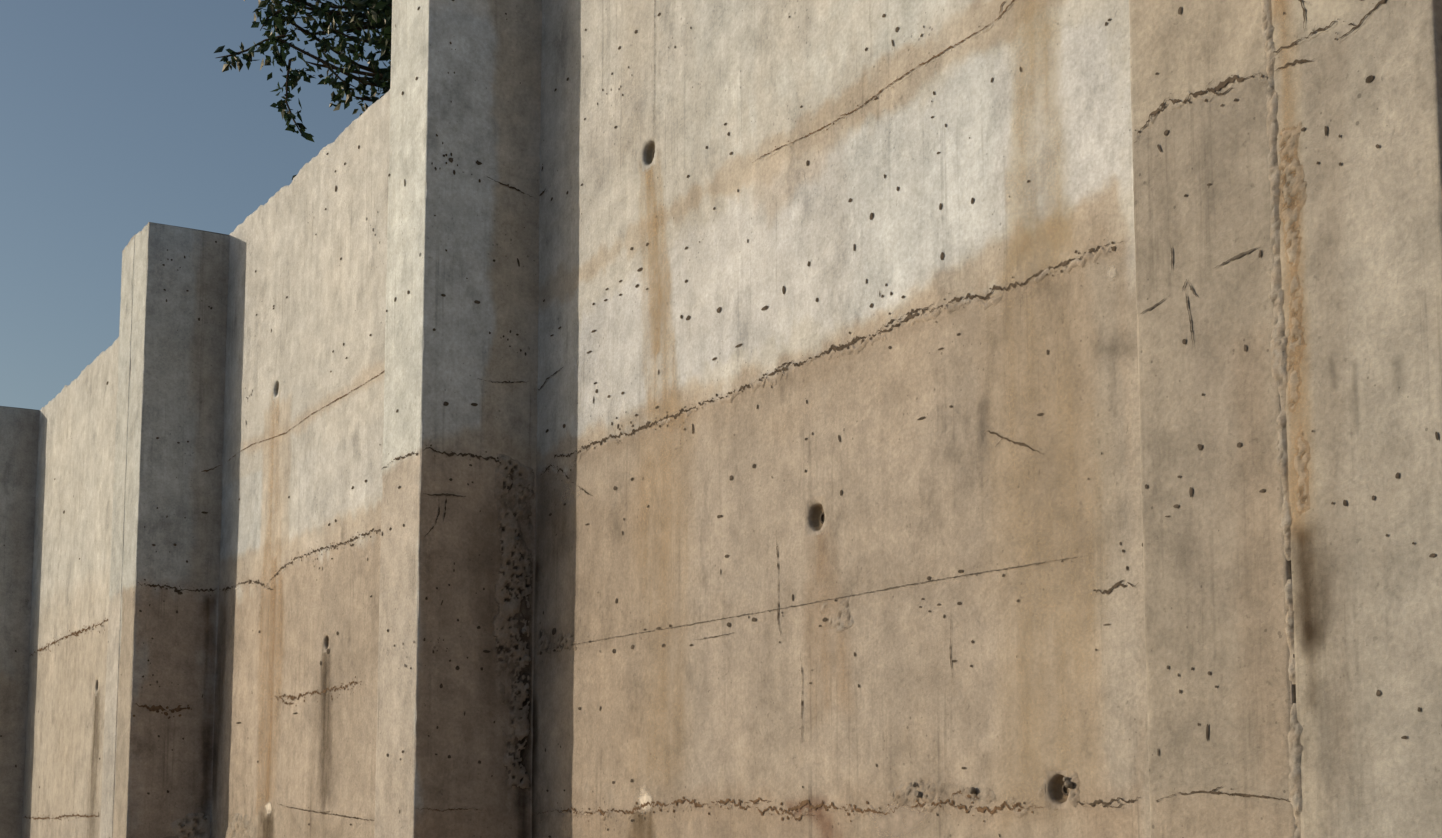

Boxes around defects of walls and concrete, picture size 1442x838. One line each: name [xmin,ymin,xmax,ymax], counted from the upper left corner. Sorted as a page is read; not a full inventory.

crack [755,0,1018,163]
crack [1134,0,1386,143]
crack [383,239,1123,496]
crack [201,370,385,472]
crack [425,493,466,536]
crack [138,528,381,596]
crack [31,618,108,655]
water stain [639,789,651,812]
crack [537,790,1043,822]
crack [1077,786,1290,809]